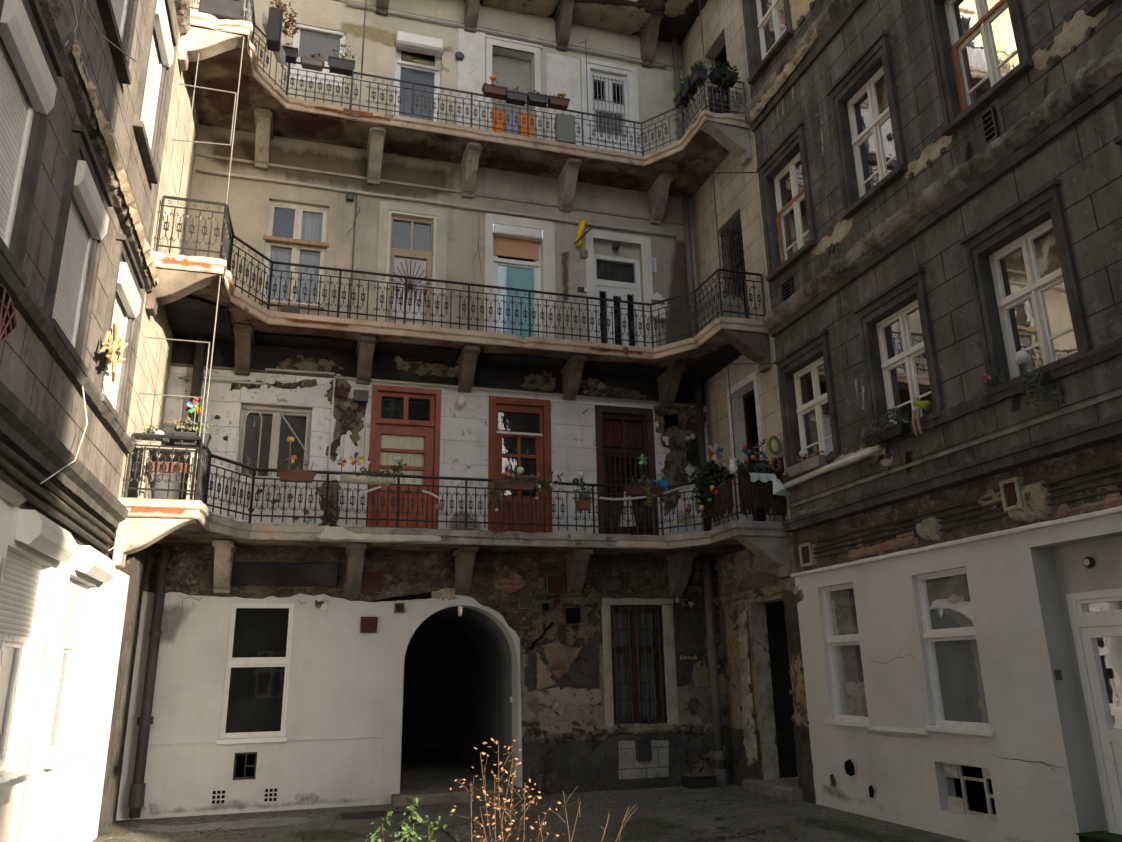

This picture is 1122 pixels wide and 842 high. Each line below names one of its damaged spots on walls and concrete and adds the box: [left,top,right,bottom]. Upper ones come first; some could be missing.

flaking render [1028,4,1111,71]
flaking render [905,125,953,180]
flaking render [812,161,967,273]
flaking render [226,353,366,462]
flaking render [583,377,707,514]
flaking render [848,531,919,561]
flaking render [521,610,602,714]